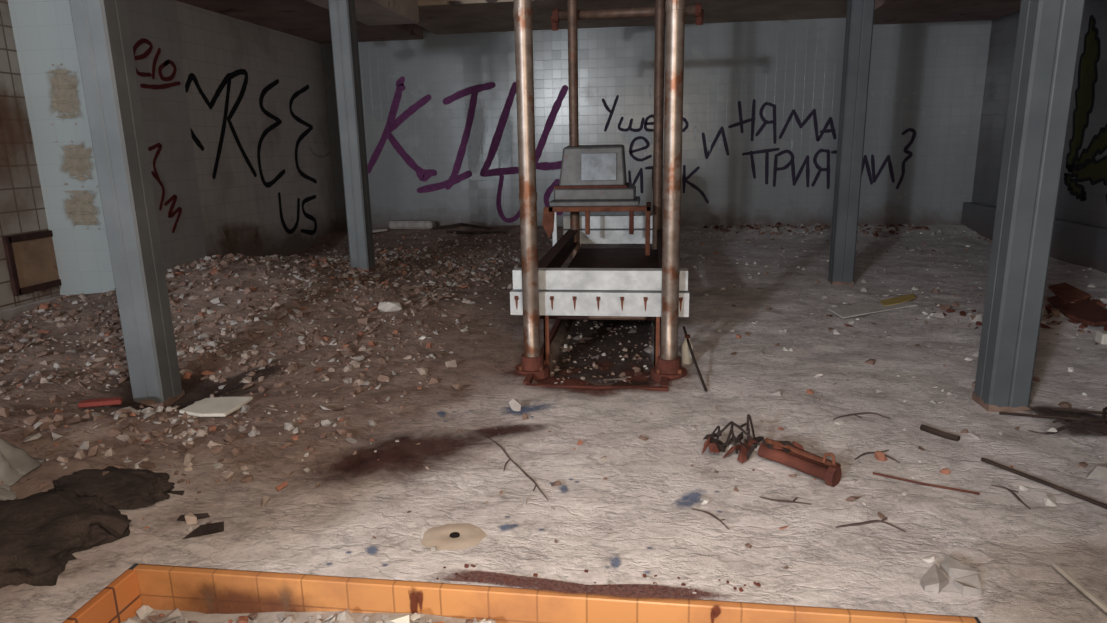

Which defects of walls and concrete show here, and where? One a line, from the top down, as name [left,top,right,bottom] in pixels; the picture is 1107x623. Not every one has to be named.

peeling [50,63,79,125]
peeling [55,140,100,230]
rust [508,371,688,396]